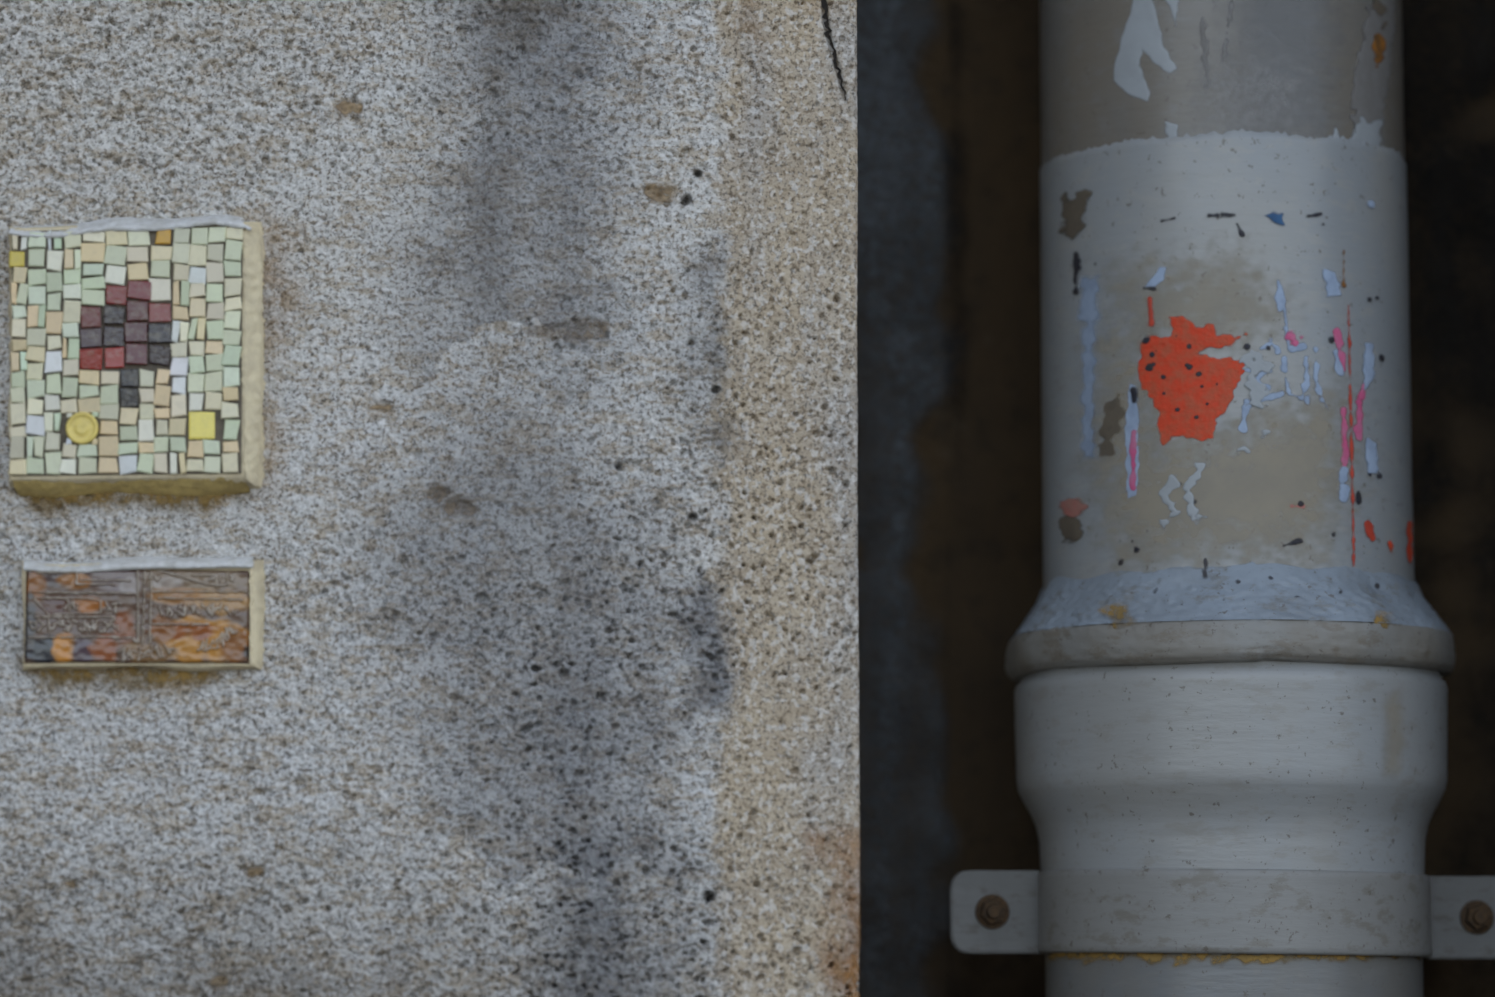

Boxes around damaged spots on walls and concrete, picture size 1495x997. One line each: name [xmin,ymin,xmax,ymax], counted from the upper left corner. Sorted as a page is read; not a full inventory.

crack [821,0,846,100]
peeling [1114,0,1179,101]
peeling [1142,287,1218,419]
peeling [1099,387,1137,491]
peeling [1058,516,1083,543]
peeling [1158,462,1207,528]